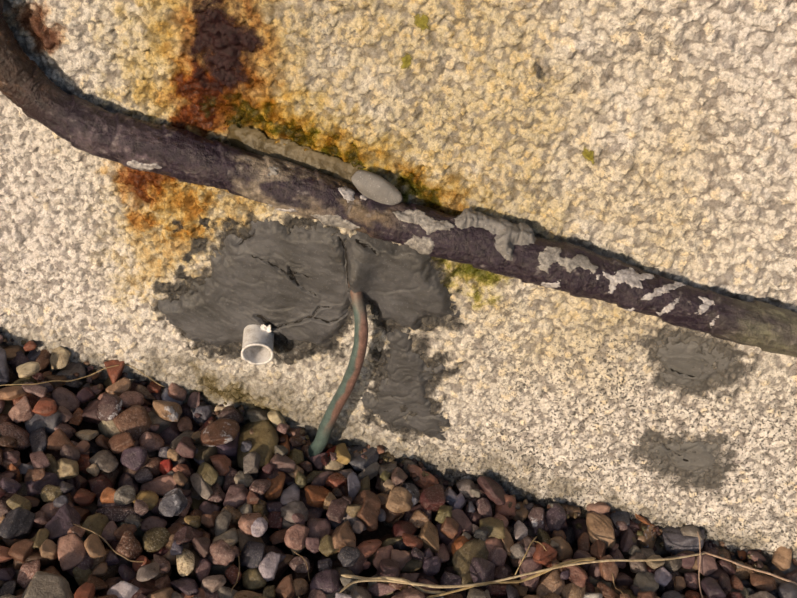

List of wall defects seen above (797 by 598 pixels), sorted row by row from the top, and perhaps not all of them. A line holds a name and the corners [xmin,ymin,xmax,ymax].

corrosion [21,6,58,52]
corrosion [172,0,264,136]
corrosion [122,167,174,203]
crack [239,233,338,343]